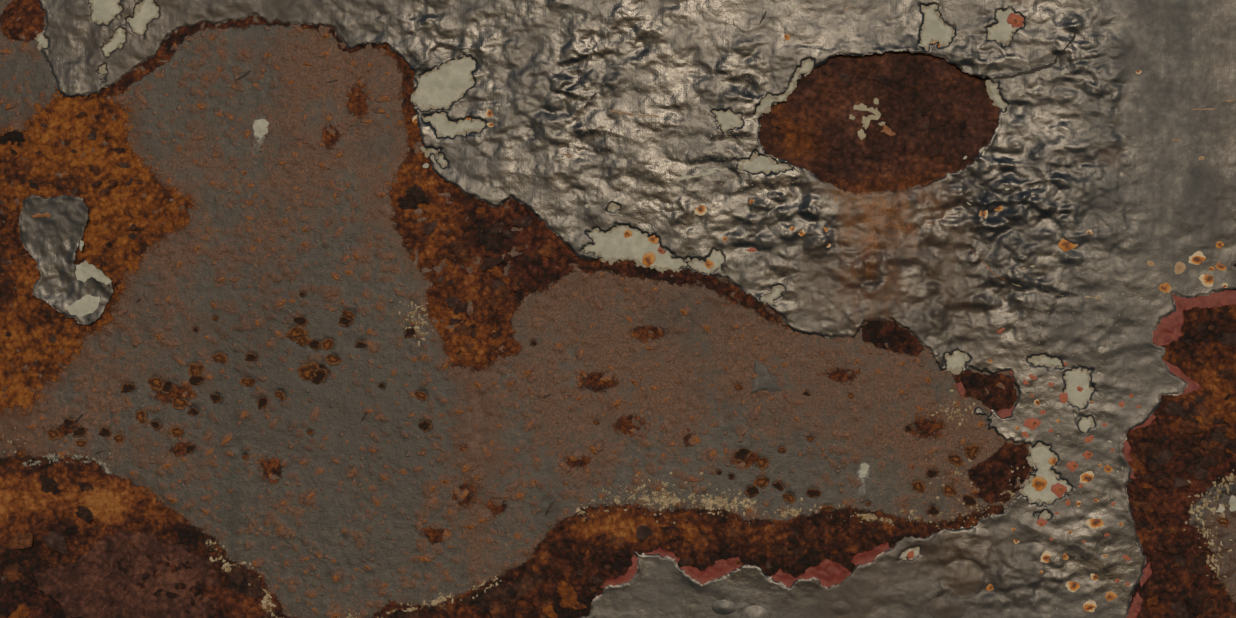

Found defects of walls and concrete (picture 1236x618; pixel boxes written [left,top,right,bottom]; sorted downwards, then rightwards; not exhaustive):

peeling [89,0,159,81]
peeling [411,55,485,168]
peeling [756,59,814,115]
rust [759,51,1000,275]
peeling [18,194,115,325]
peeling [582,202,724,274]
rust [0,454,291,618]
rust [372,442,1033,618]
rust [862,319,924,356]
rust [952,369,1019,419]
peeling [1019,442,1072,520]
rust [1036,241,1236,618]